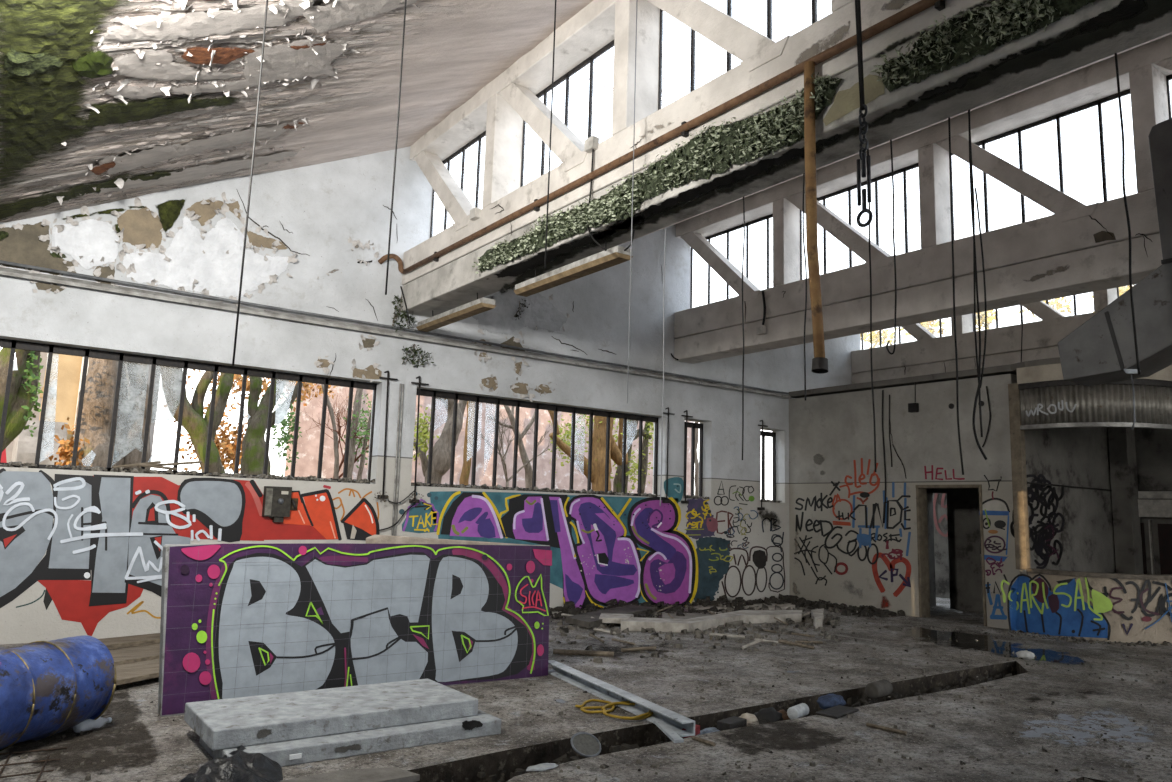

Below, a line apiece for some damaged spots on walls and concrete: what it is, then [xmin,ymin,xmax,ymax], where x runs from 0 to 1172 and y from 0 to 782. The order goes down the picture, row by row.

peeling [90,0,420,105]
peeling [0,219,76,293]
peeling [93,260,119,287]
peeling [351,334,385,382]
peeling [472,336,555,402]